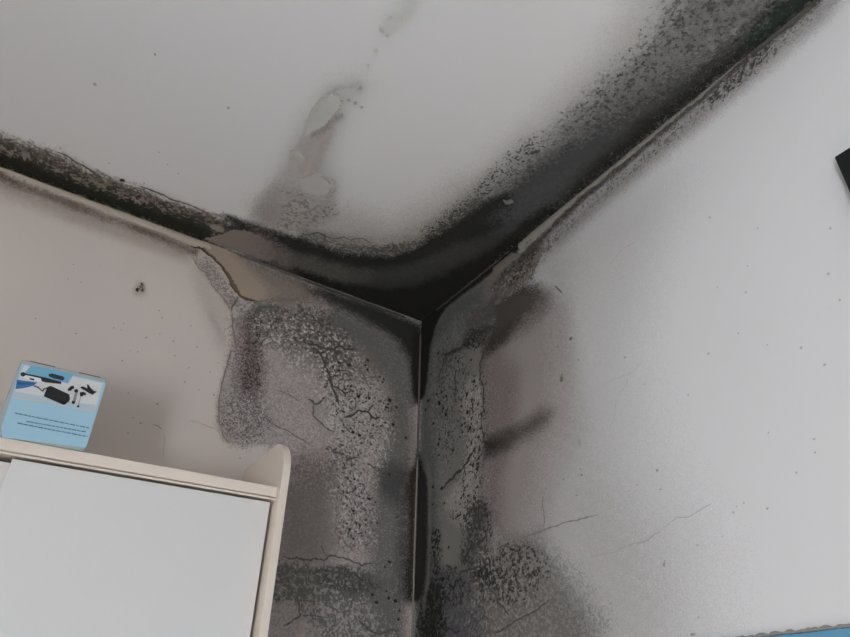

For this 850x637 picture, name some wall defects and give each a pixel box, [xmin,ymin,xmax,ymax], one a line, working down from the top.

water stain [0,171,199,267]
peeling [200,224,284,301]
crack [439,325,494,396]
crack [263,343,381,469]
crack [443,355,485,488]
crack [282,546,377,574]
crack [497,496,710,558]
crack [283,590,398,635]